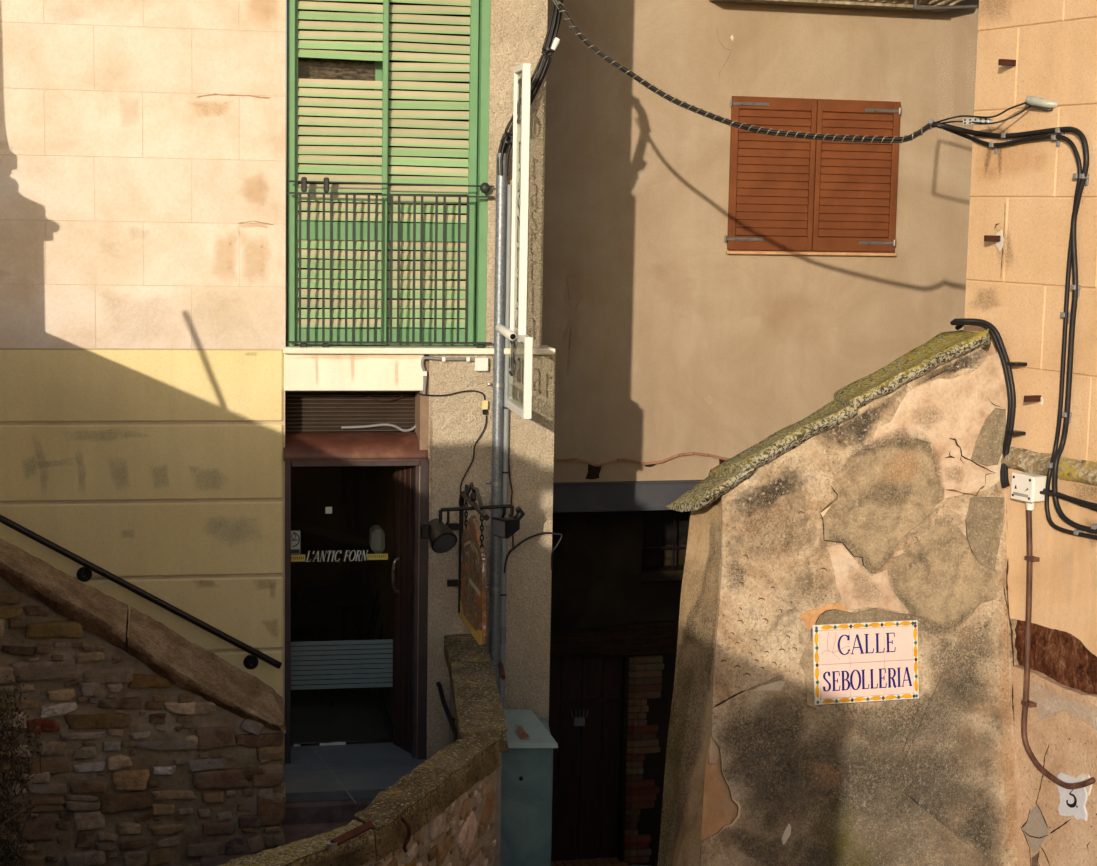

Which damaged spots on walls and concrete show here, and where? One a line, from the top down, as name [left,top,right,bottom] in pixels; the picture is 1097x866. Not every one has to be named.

crack [196,92,271,100]
flaking render [779,602,847,630]
flaking render [708,738,741,836]
flaking render [1021,805,1049,866]